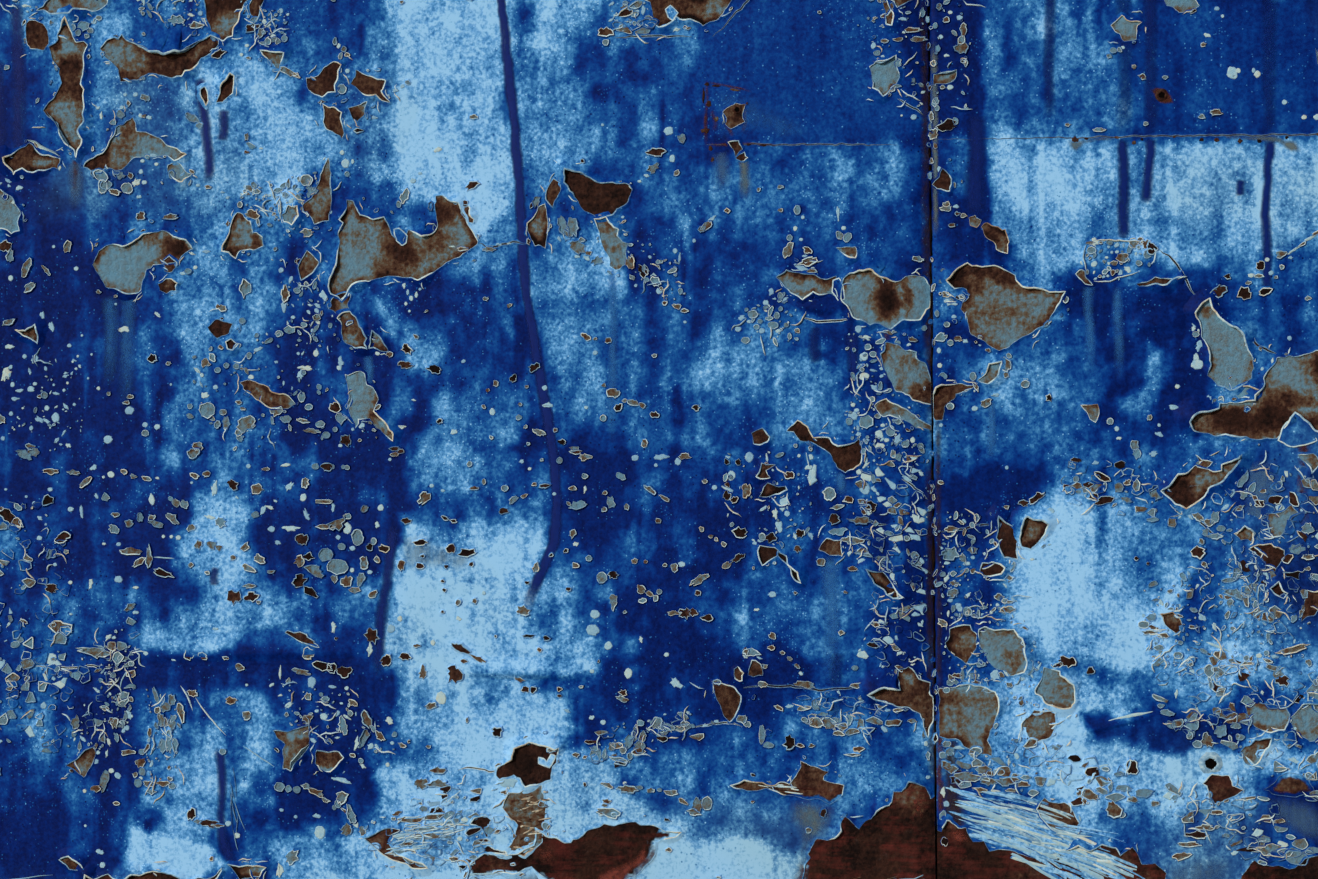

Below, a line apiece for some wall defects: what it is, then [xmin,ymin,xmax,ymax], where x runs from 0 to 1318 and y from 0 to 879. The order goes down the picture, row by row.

peeling [186,806,240,838]
peeling [0,0,510,807]
peeling [269,0,1318,879]